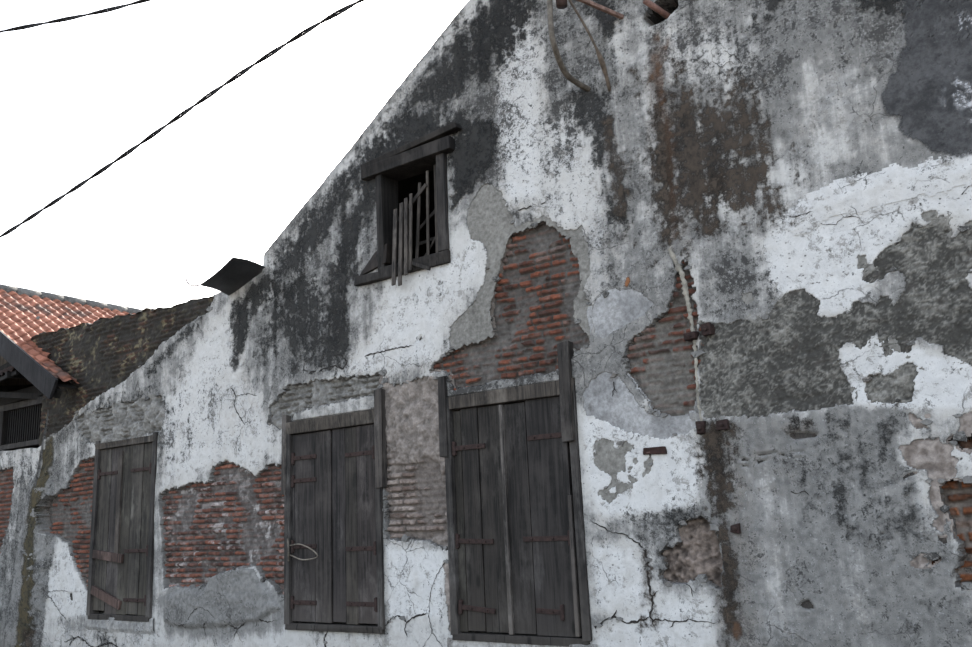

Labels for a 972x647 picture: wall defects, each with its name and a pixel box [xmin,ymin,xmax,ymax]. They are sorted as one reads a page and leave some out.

leakage [856,0,972,158]
leakage [229,0,540,380]
spalling [30,296,214,446]
peeling [268,182,972,632]
spalling [0,469,14,553]
spalling [48,458,95,586]
spalling [162,461,284,602]
crack [594,523,715,630]